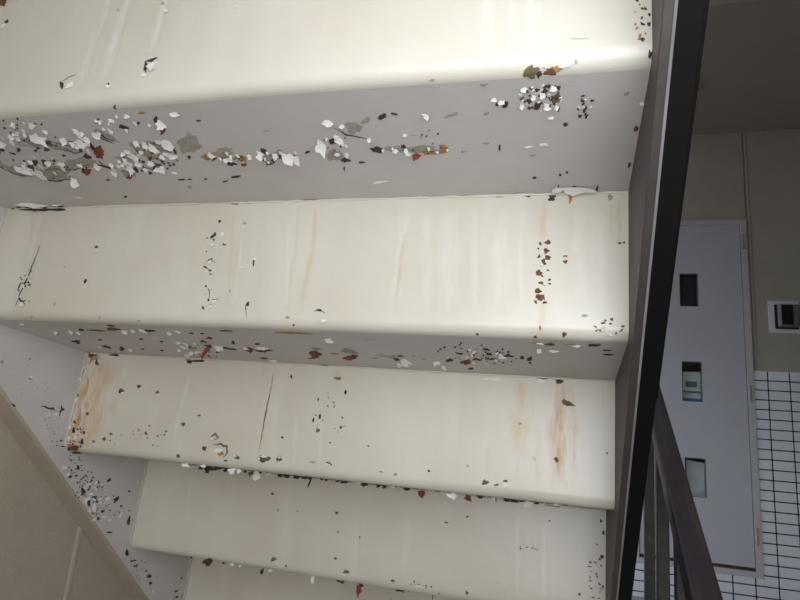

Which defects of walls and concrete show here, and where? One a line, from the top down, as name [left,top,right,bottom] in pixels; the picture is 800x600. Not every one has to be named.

peeling [518,84,562,120]
peeling [577,95,594,119]
peeling [0,105,450,199]
crack [15,245,40,307]
peeling [167,330,277,364]
peeling [433,342,559,371]
peeling [62,452,130,526]
rust [66,338,144,454]
crack [259,375,275,450]
peeling [176,433,425,499]
peeling [436,491,595,509]
rust [479,378,581,498]